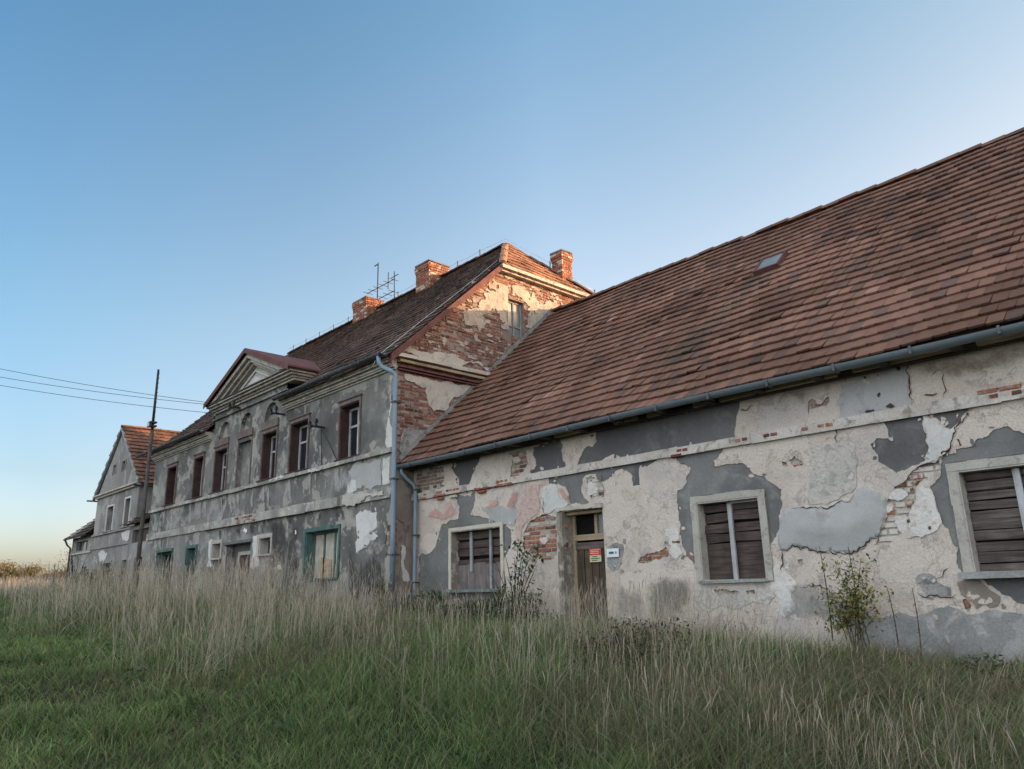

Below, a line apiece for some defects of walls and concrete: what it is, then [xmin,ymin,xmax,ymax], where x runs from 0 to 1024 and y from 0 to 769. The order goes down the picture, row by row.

peeling [410,312,510,360]
flaking render [355,401,782,611]
spalling [696,556,800,620]
flaking render [871,404,1024,614]